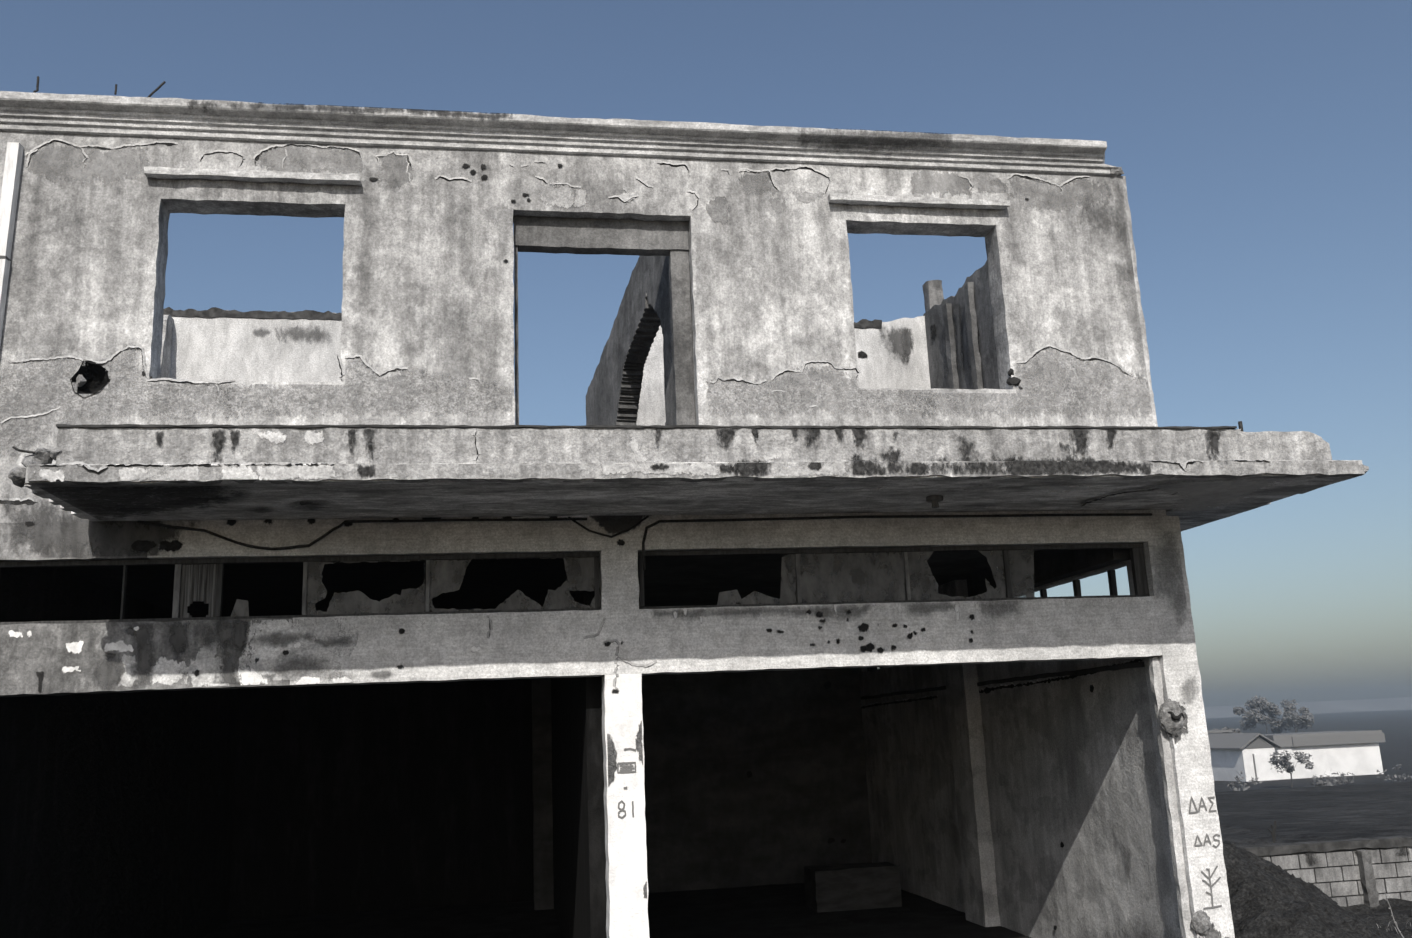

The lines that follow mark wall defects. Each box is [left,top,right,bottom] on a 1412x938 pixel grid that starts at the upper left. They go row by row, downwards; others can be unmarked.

peeling [259,146,413,189]
peeling [462,163,488,180]
peeling [739,171,824,214]
crack [1016,345,1134,377]
peeling [0,346,513,482]
water stain [348,429,375,477]
water stain [651,429,669,471]
water stain [717,428,758,447]
water stain [720,460,771,476]
peeling [62,641,84,673]
peeling [104,618,358,687]
peeling [1199,923,1229,938]